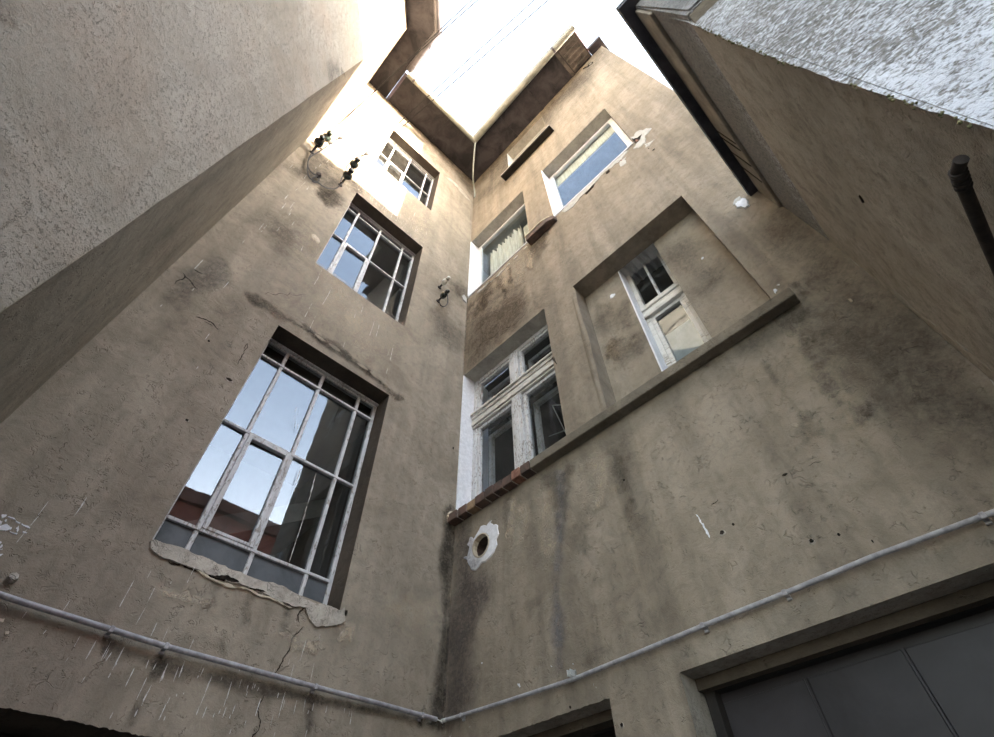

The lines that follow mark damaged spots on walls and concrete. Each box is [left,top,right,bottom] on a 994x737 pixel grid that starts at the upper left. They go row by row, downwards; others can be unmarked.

spalling [562,128,655,212]
crack [168,561,199,573]
spalling [149,539,348,628]
crack [247,587,305,673]
leakage [432,505,487,728]
leakage [134,660,185,717]
leakage [196,668,370,736]